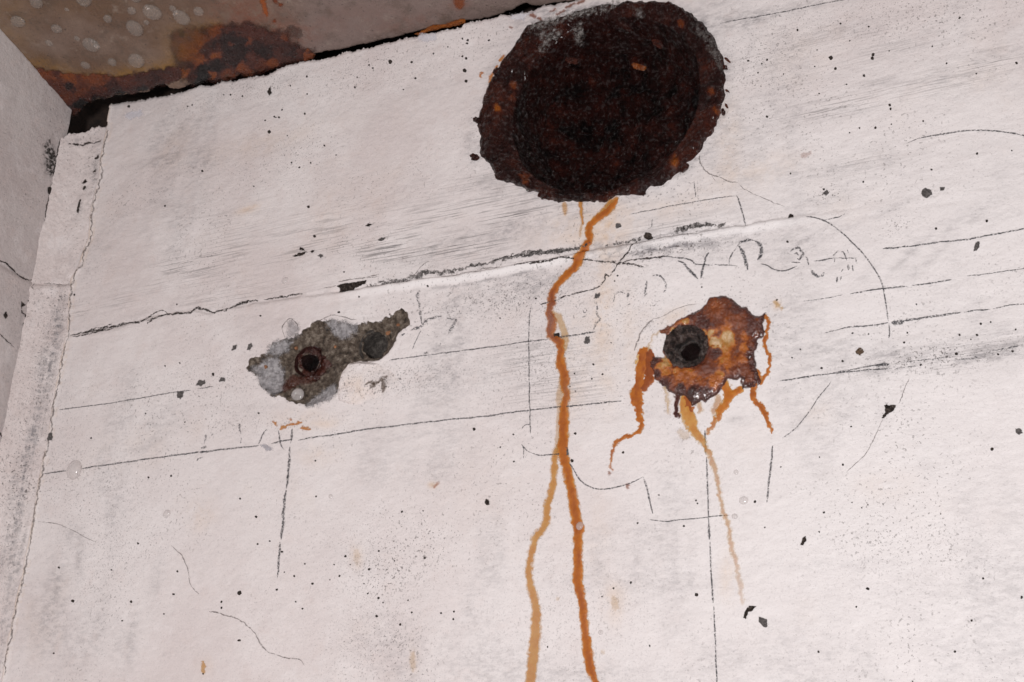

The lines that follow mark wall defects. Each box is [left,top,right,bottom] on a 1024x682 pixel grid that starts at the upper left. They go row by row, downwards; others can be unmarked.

rust [36,0,315,115]
crack [0,131,355,673]
spalling [231,308,410,407]
crack [415,240,663,305]
rust [525,193,618,682]
rust [610,296,774,470]